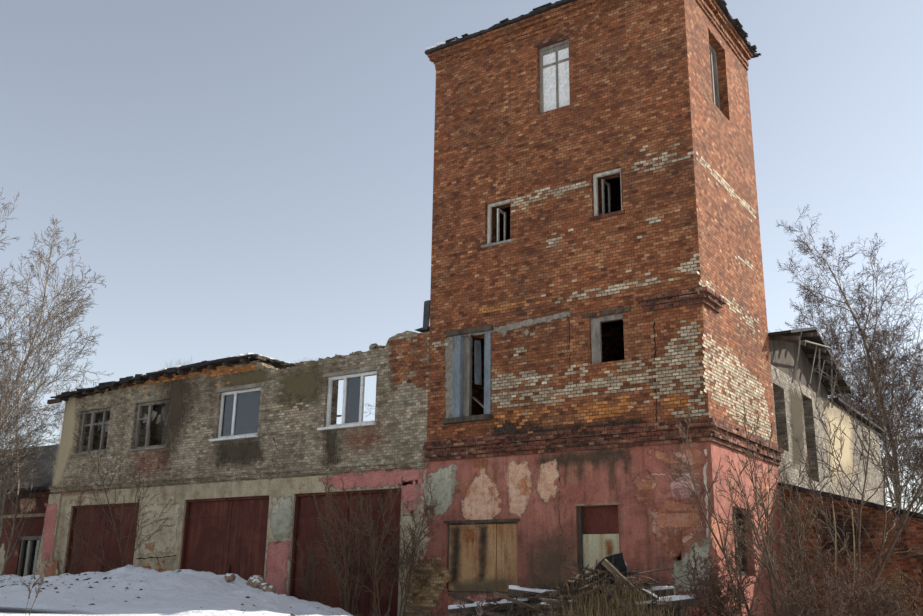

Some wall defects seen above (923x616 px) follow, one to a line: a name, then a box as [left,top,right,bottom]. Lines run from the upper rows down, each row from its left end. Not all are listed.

peeling [20,497,64,577]
peeling [319,459,561,616]
peeling [647,442,726,594]